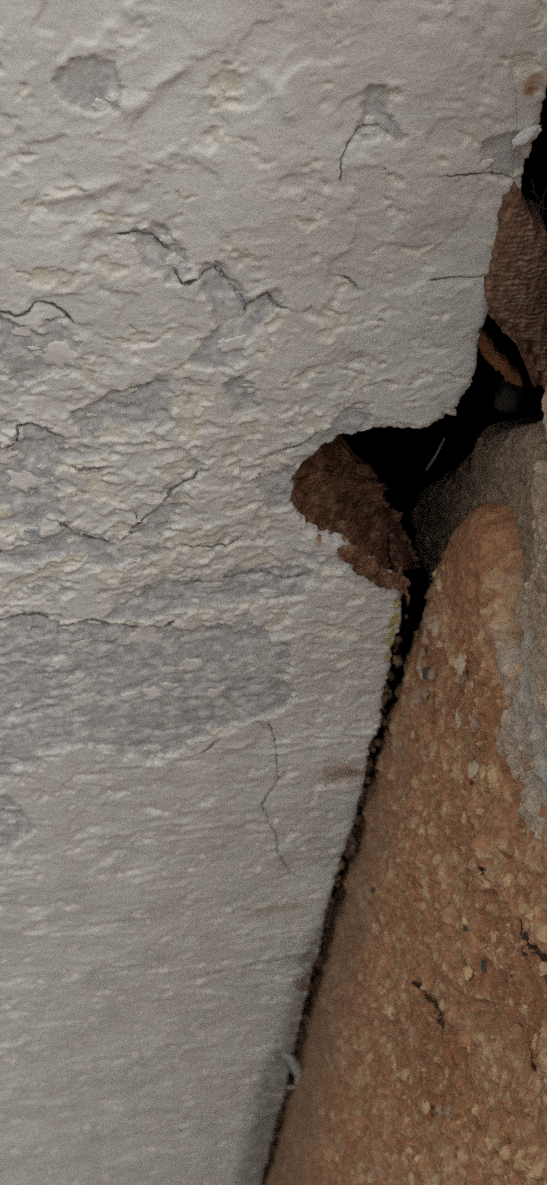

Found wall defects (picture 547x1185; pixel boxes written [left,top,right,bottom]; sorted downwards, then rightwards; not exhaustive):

peeling [357,86,402,140]
crack [0,301,73,321]
crack [119,231,285,311]
peeling [134,227,280,366]
crack [0,422,60,451]
peeling [315,402,369,445]
spalling [412,613,443,706]
spalling [450,653,502,699]
crack [208,684,296,876]
spalling [468,760,488,779]
spalling [463,960,487,980]
spalling [399,1067,452,1129]